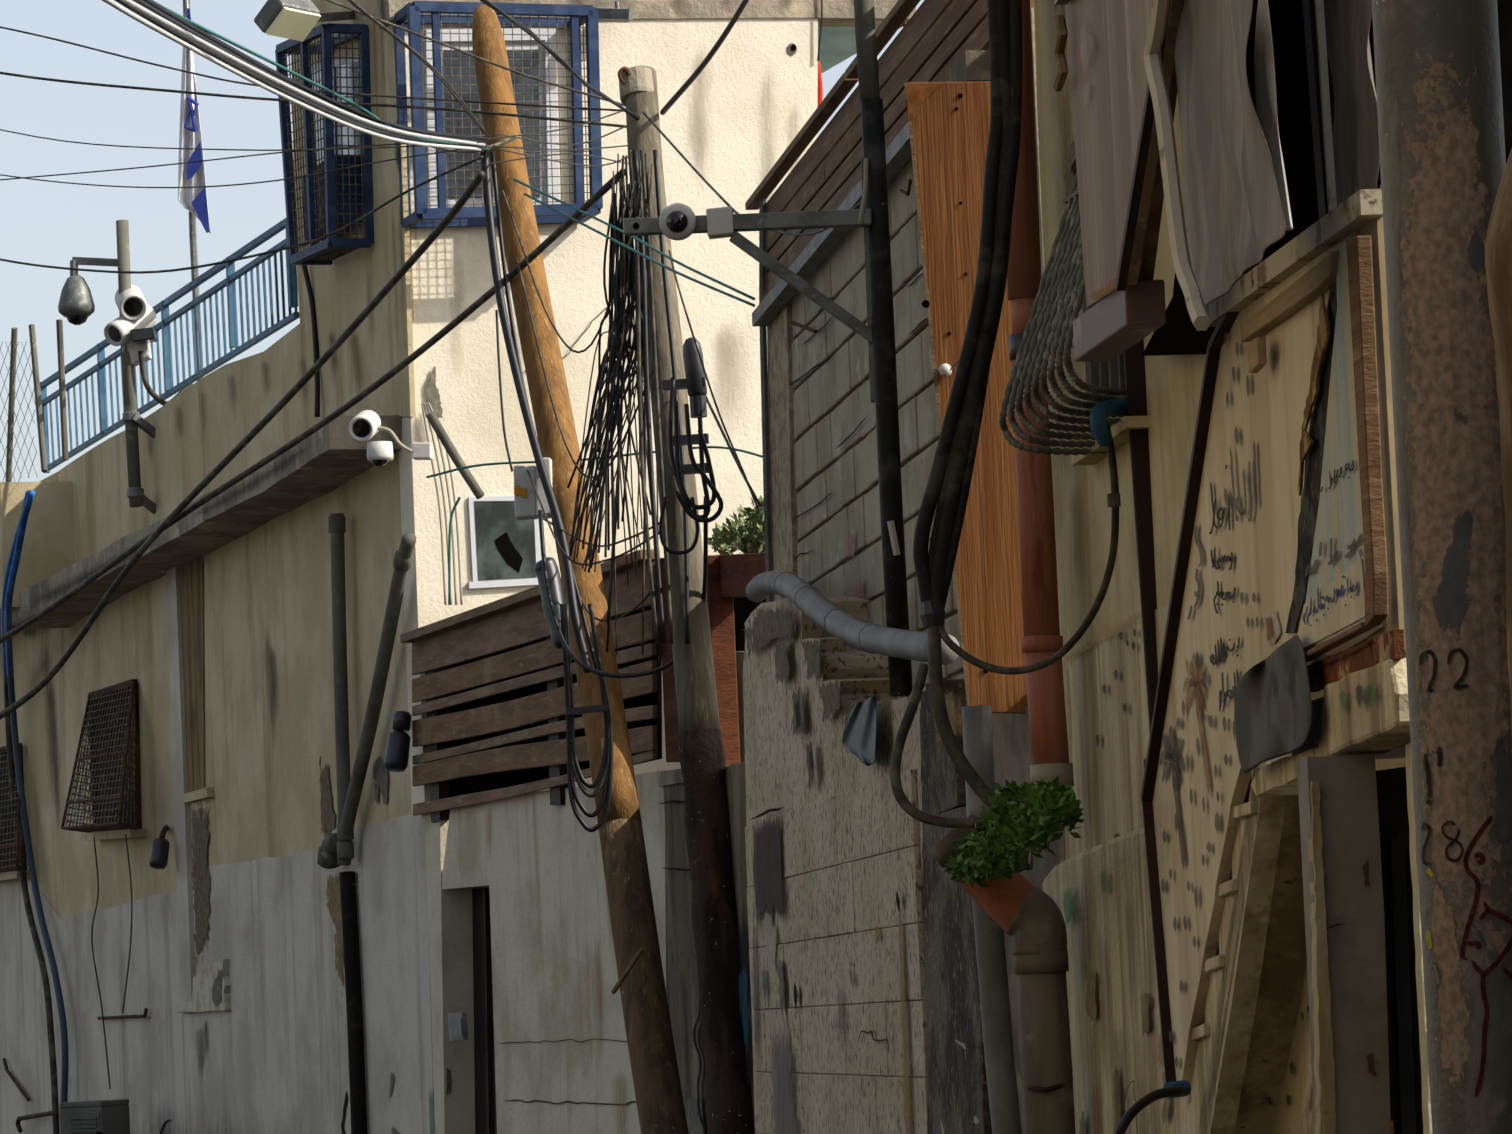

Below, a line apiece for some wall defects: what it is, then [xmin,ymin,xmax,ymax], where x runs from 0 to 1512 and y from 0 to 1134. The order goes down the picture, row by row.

flaking render [177,801,231,1013]
crack [505,1037,627,1045]
crack [503,1099,636,1107]